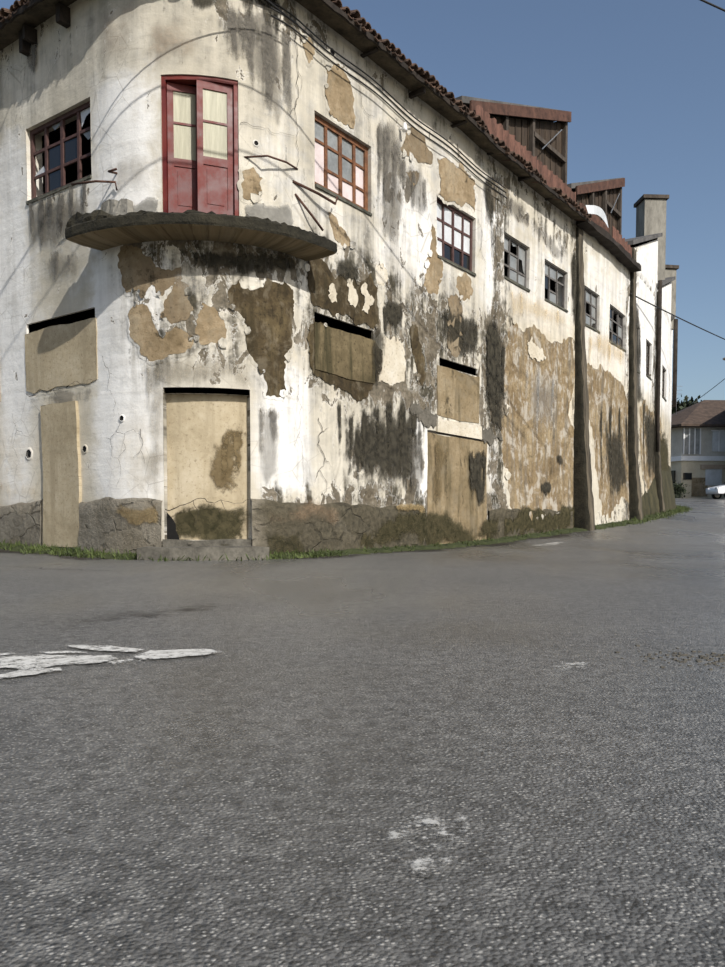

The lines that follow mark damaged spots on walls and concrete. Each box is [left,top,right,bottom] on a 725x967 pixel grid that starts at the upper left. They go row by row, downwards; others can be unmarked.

leakage [193,0,292,107]
flaking render [300,33,357,133]
leakage [29,181,86,245]
flaking render [237,164,266,204]
flaking render [398,124,478,215]
flaking render [115,243,296,402]
flaking render [305,259,427,403]
leakage [338,404,423,490]
leakage [433,441,448,500]
leakage [444,309,505,430]
flaking render [482,315,575,520]
flaking render [587,361,663,522]